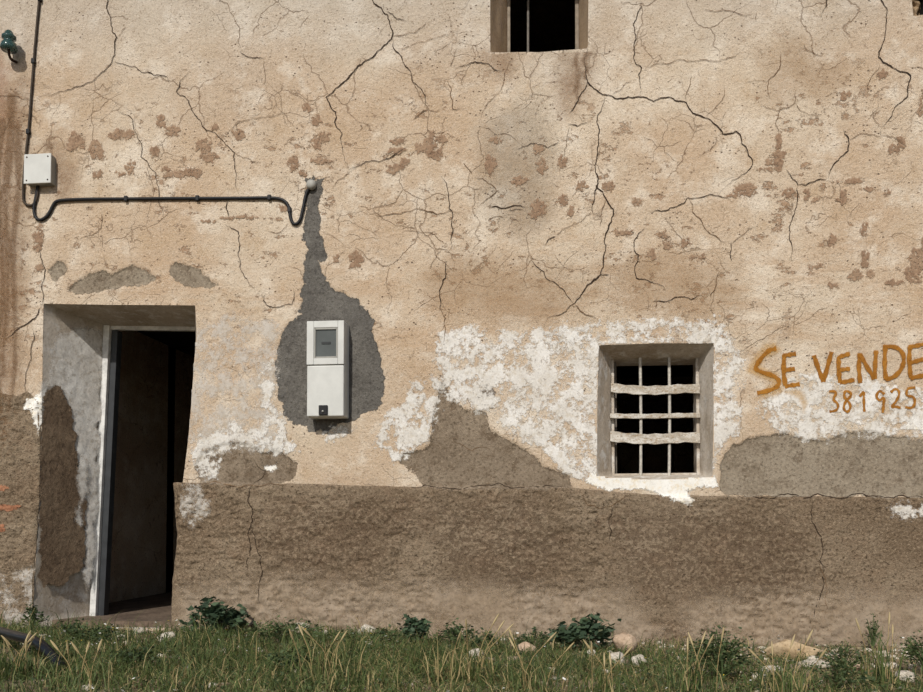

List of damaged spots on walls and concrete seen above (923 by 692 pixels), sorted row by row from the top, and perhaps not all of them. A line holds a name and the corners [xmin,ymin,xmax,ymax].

crack [10,251,45,393]
spalling [35,261,67,281]
spalling [69,264,157,294]
crack [0,0,294,308]
spalling [169,261,218,289]
crack [326,0,511,184]
crack [373,164,523,339]
crack [514,8,753,325]
crack [787,0,922,259]
spalling [912,0,923,16]
spalling [0,328,103,627]
peeling [374,314,923,519]